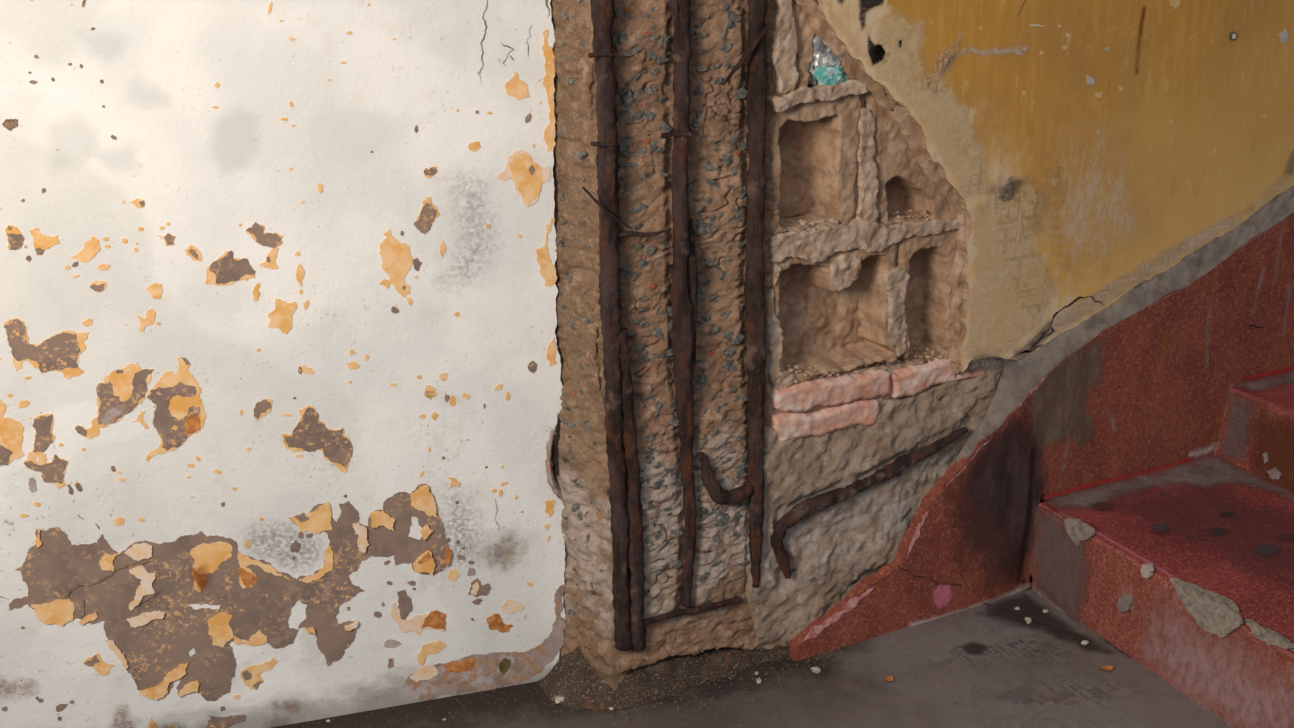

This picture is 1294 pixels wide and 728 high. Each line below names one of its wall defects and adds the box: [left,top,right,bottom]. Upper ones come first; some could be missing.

crack [479,0,550,87]
peeling [2,119,18,131]
spalling [9,0,1044,728]
corrosion [687,217,698,349]
leakage [970,323,1050,369]
crack [1015,296,1104,356]
leakage [890,344,1294,661]